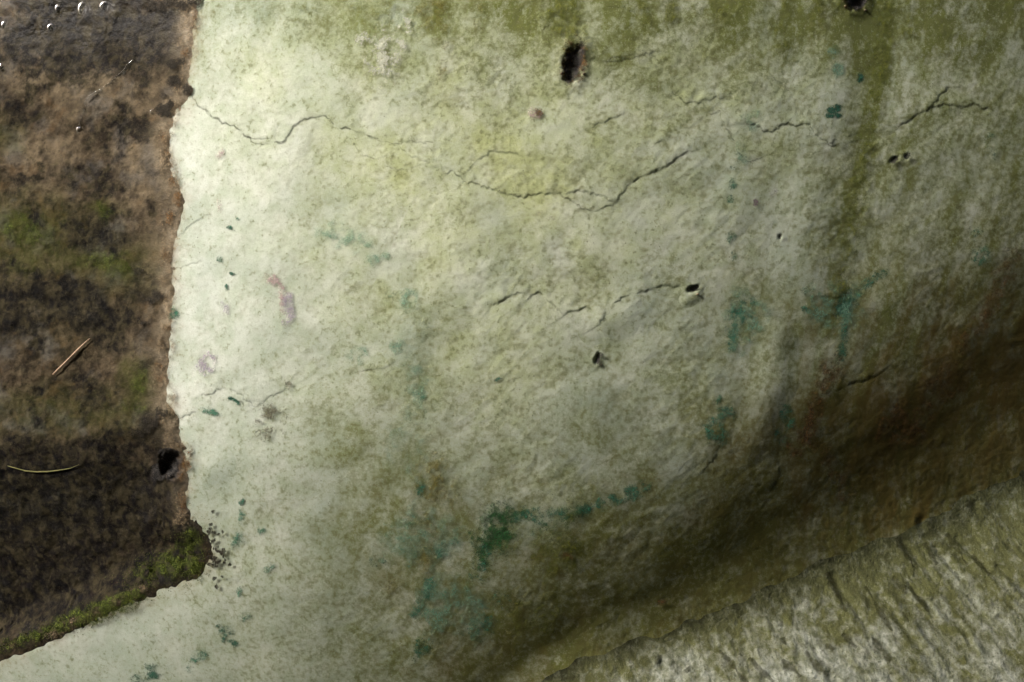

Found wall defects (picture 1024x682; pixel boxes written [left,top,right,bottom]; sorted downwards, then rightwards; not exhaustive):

spalling [560,40,587,83]